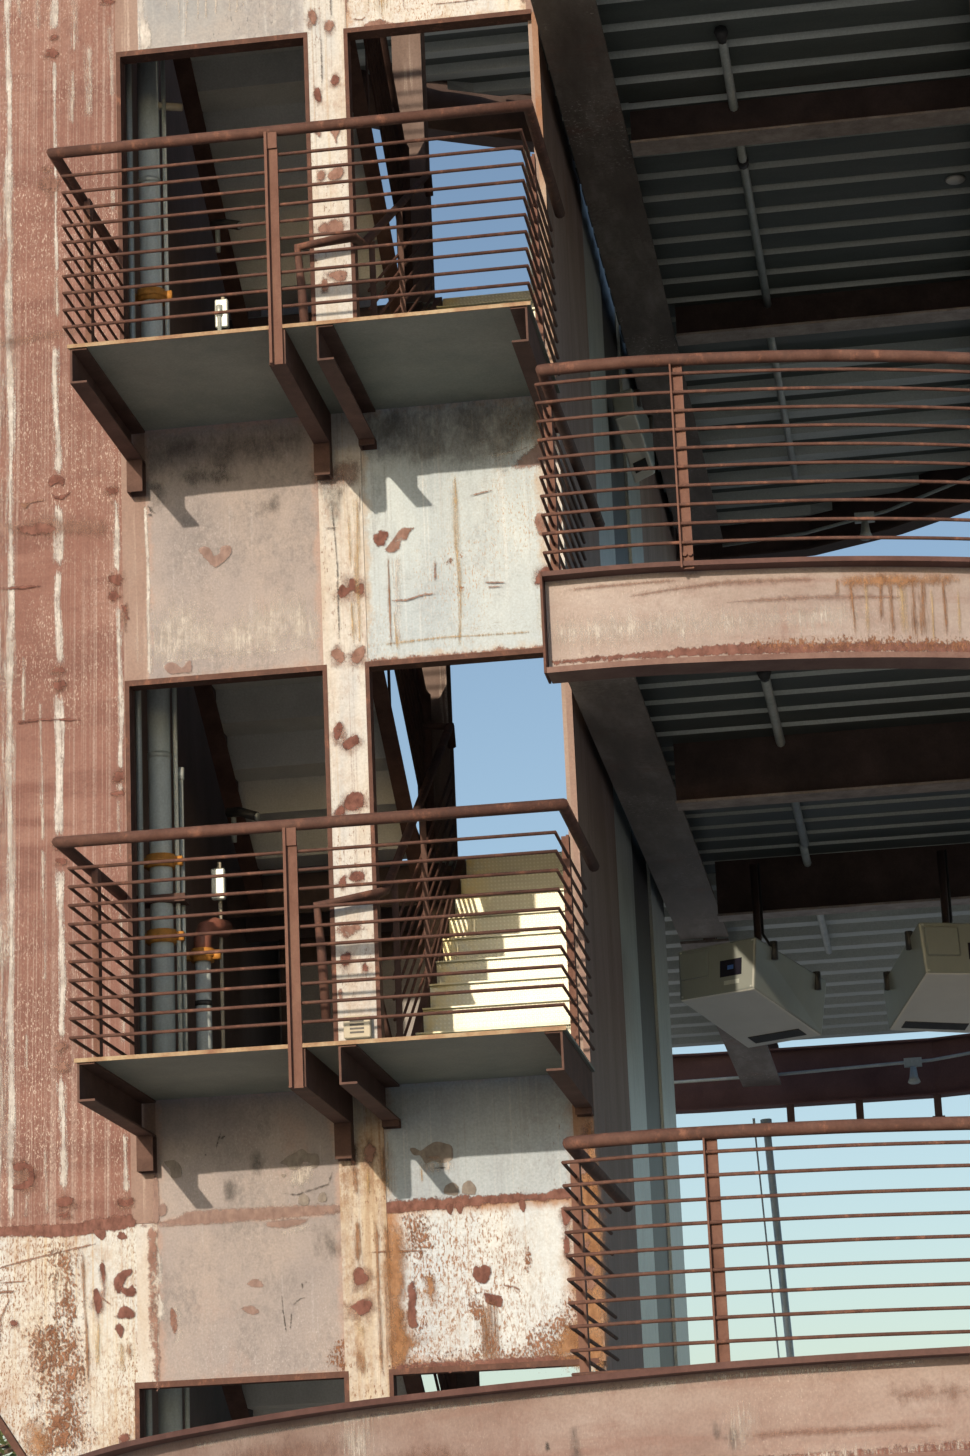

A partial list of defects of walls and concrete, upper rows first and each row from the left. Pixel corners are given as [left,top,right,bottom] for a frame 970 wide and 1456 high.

damp [50,0,92,148]
damp [0,0,68,1218]
damp [115,608,124,791]
corrosion [333,722,359,751]
corrosion [334,792,364,815]
corrosion [339,871,365,884]
corrosion [316,463,970,666]
corrosion [12,1161,35,1190]
corrosion [0,1196,340,1456]
corrosion [349,1123,607,1375]